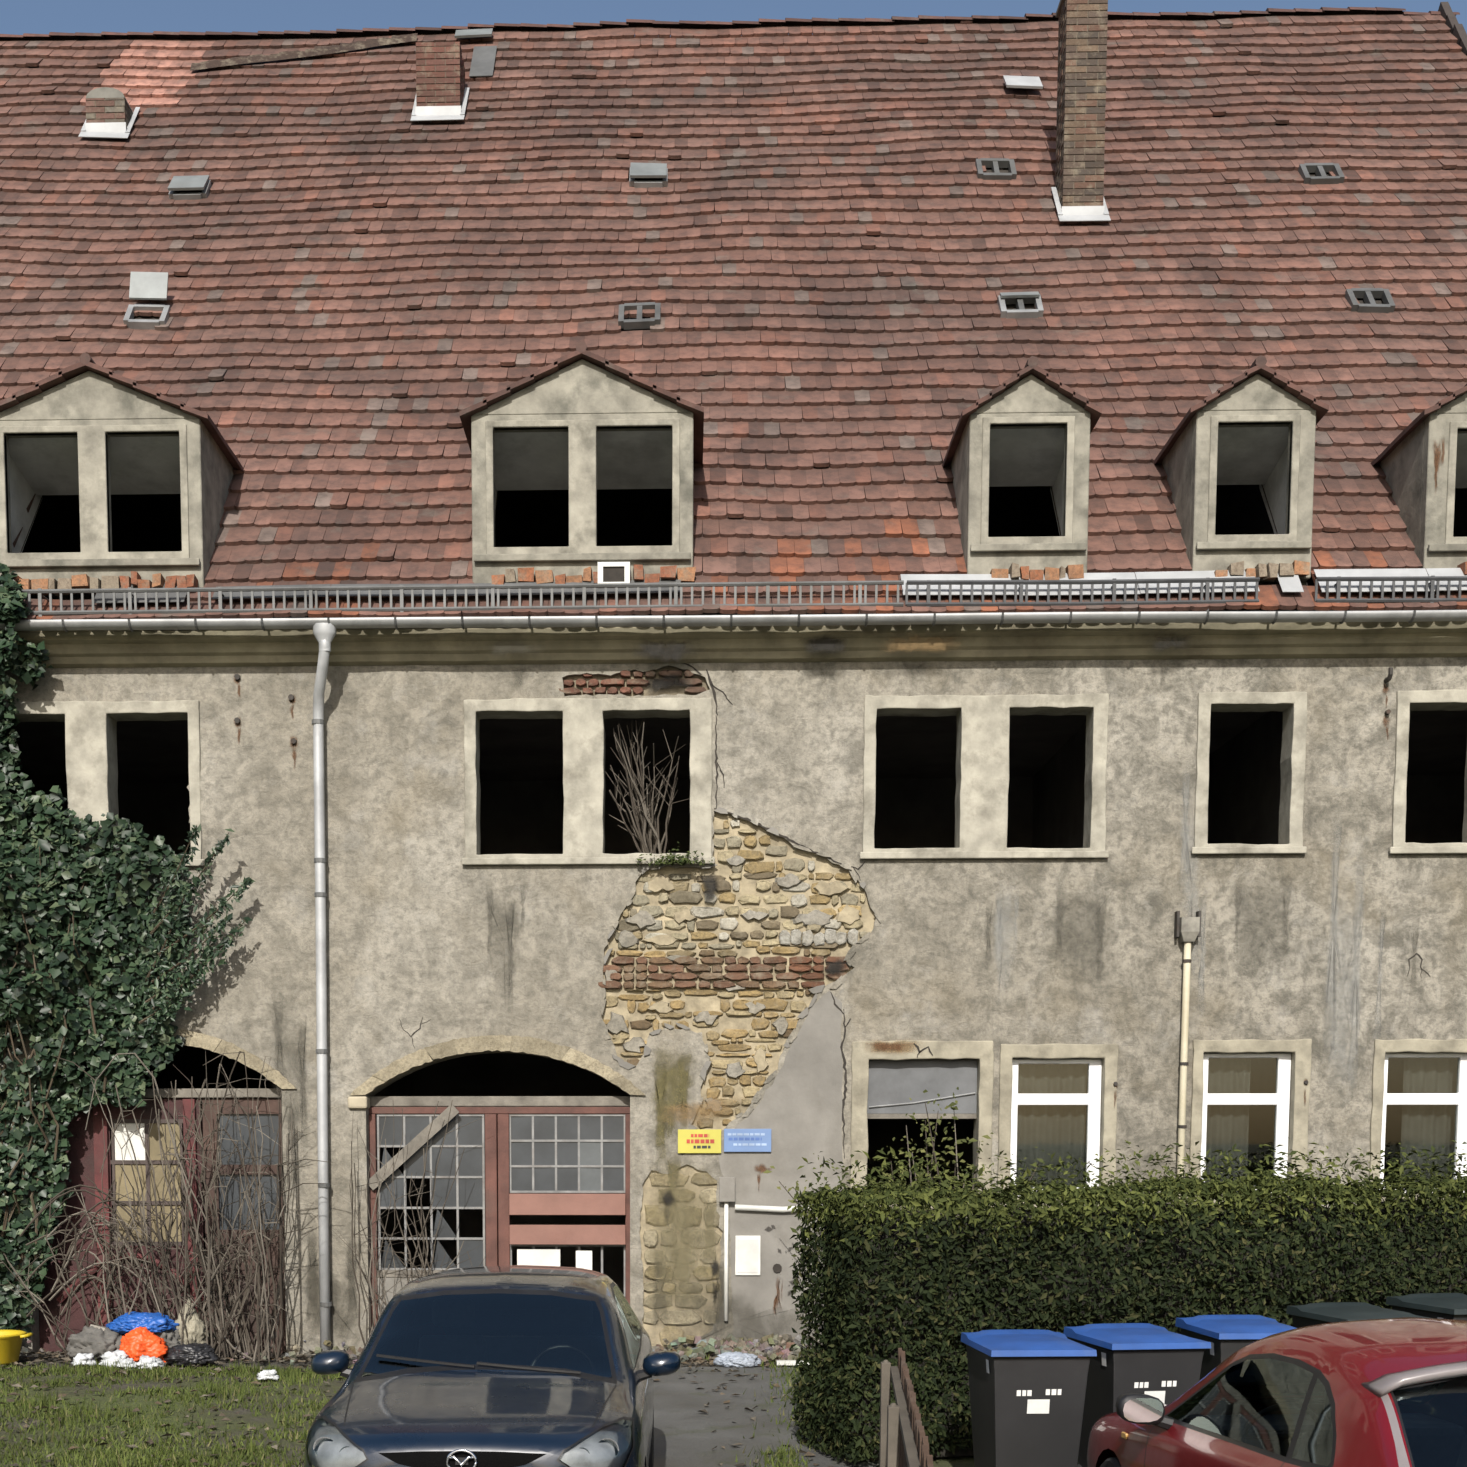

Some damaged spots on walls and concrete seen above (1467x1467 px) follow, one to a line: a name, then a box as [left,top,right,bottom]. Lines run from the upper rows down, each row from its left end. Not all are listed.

flaking render [559,670,706,696]
crack [684,663,865,881]
spalling [598,807,882,1131]
crack [831,993,851,1159]
spalling [640,1164,723,1347]